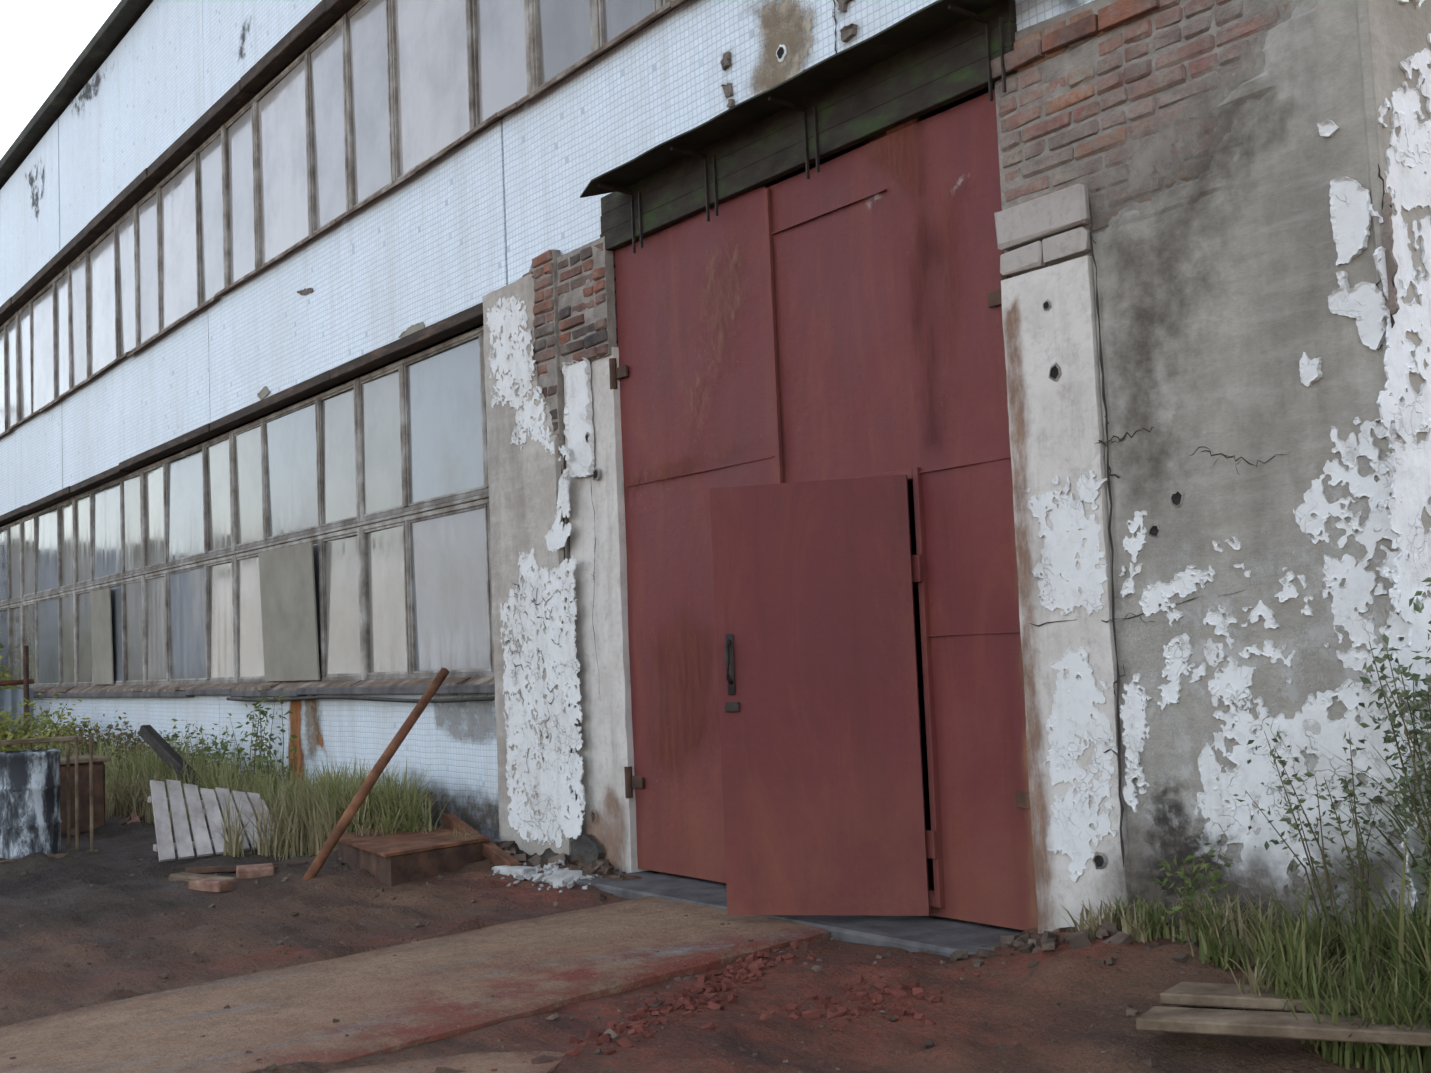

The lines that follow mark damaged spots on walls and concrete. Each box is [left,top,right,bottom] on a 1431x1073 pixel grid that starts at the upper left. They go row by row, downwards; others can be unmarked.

peeling [720,51,735,108]
peeling [753,0,813,95]
spalling [990,0,1292,233]
peeling [1397,0,1424,9]
peeling [1024,33,1431,924]
crack [1189,446,1287,473]
peeling [433,236,618,863]
crack [1029,197,1247,868]
rust [288,695,323,789]